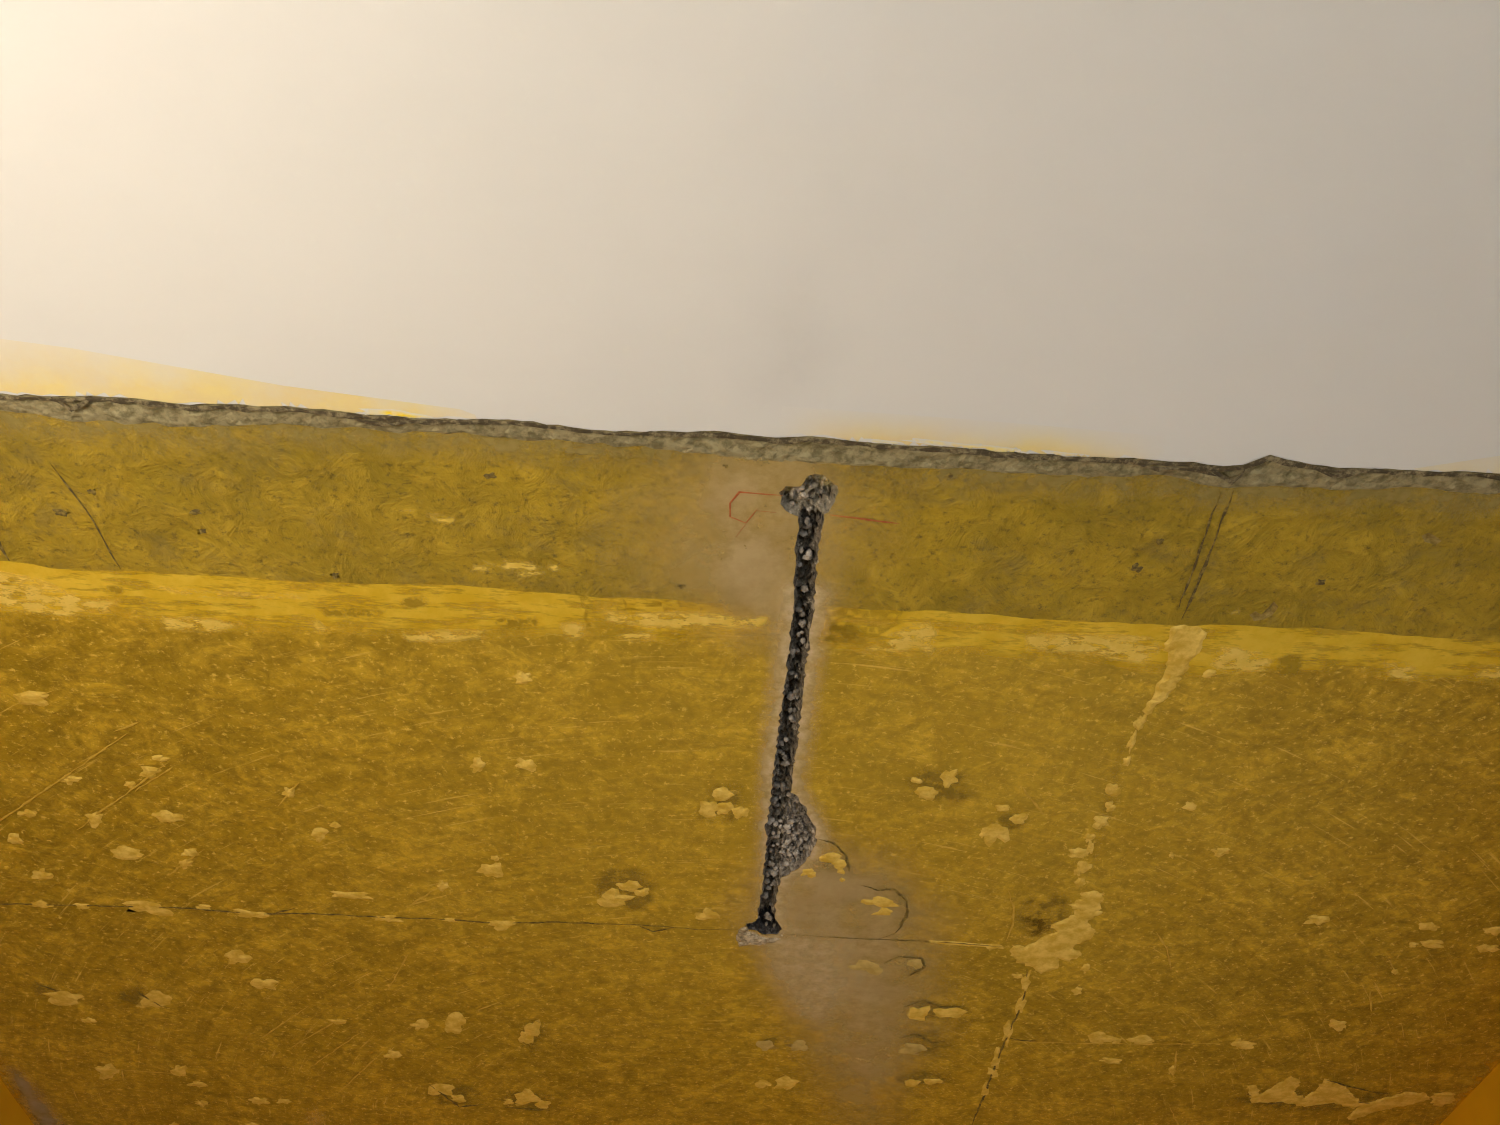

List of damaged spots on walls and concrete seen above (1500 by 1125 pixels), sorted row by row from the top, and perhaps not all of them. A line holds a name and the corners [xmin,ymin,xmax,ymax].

crack [0,395,1500,620]
spalling [0,393,1500,948]
water stain [662,460,924,1104]
peeling [848,956,926,976]
peeling [1010,783,1121,995]
peeling [1328,1019,1347,1032]
peeling [1241,1076,1456,1120]
peeling [1476,926,1500,953]